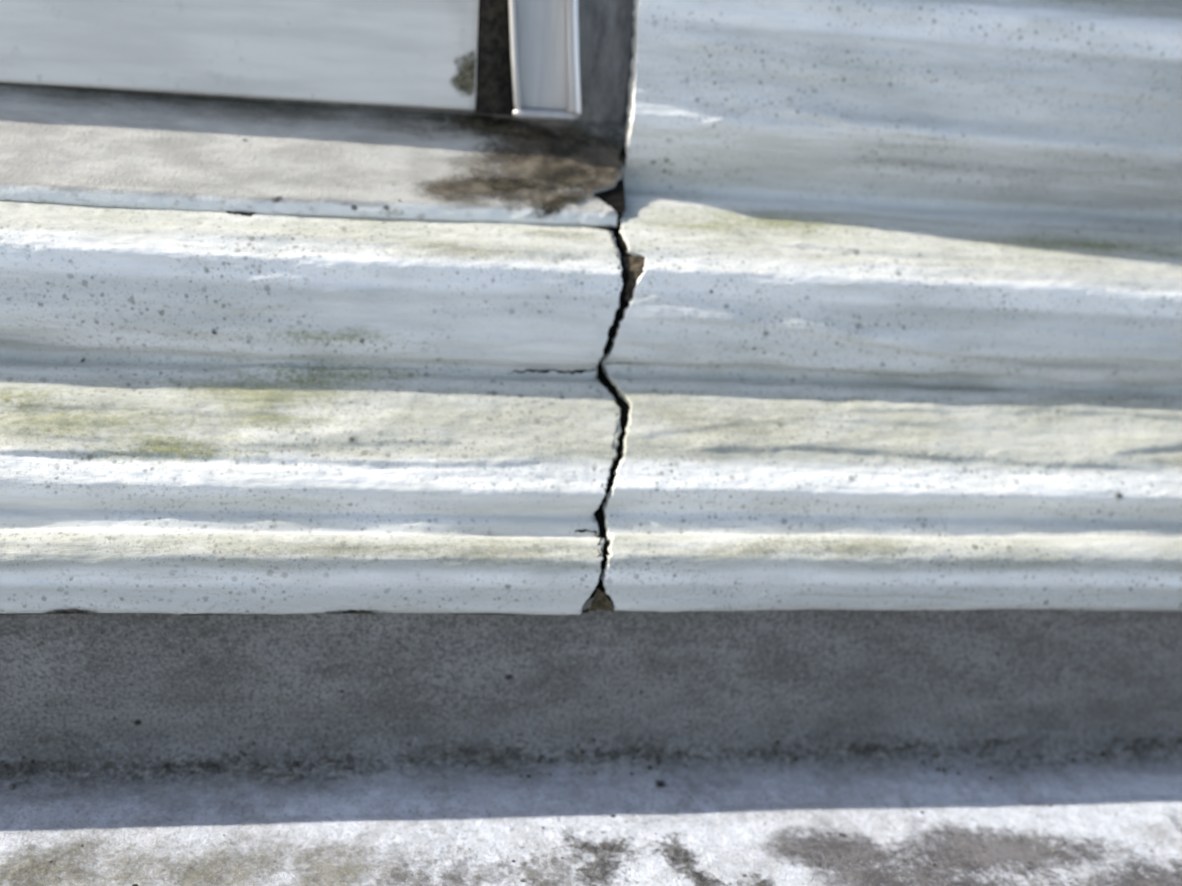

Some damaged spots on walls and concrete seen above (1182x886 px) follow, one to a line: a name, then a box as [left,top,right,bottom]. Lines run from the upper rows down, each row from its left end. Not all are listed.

water stain [426,115,579,144]
water stain [475,173,582,192]
crack [507,146,635,602]
water stain [0,843,368,886]
water stain [391,847,594,886]